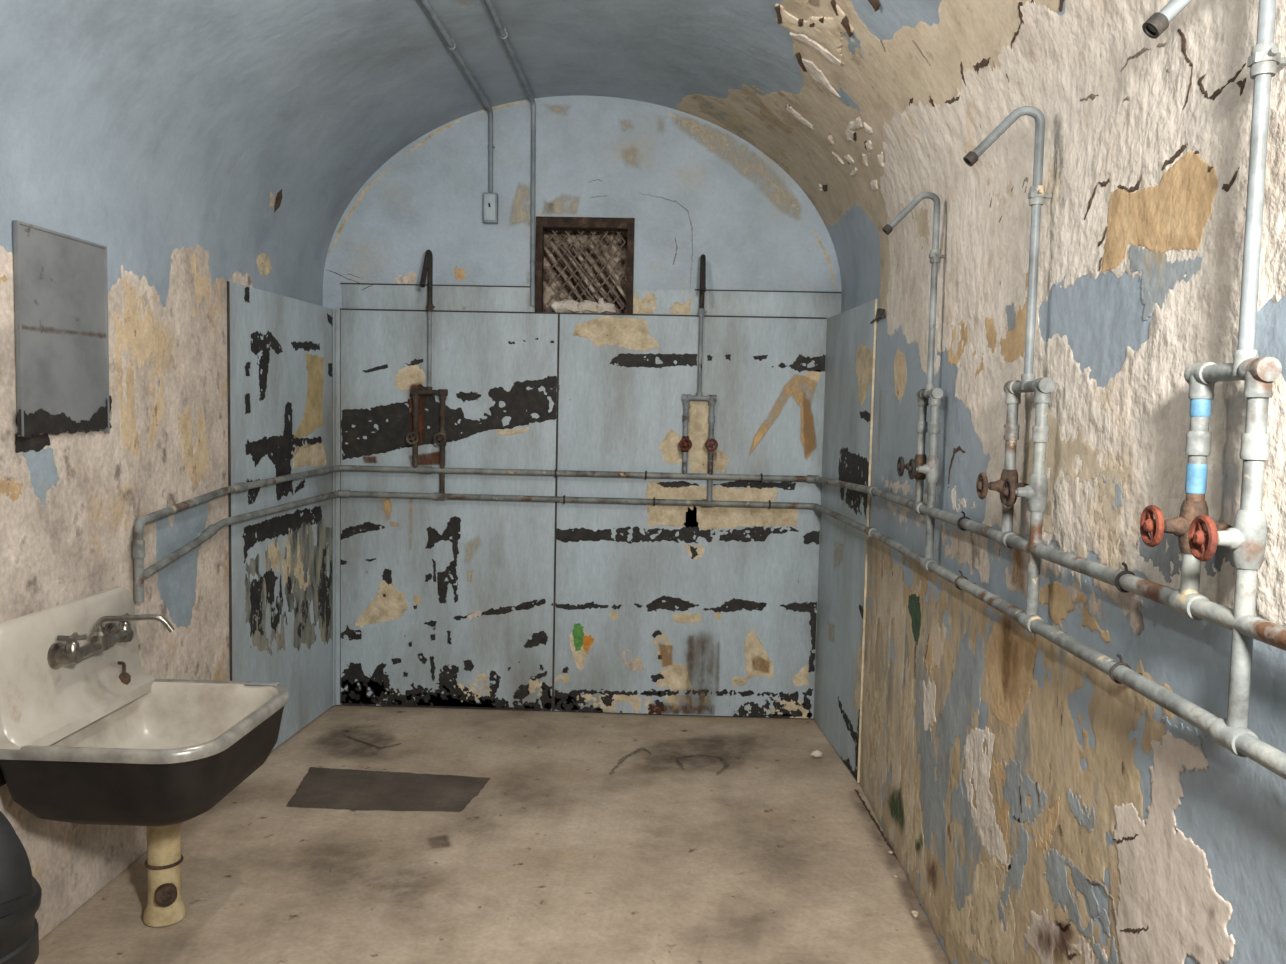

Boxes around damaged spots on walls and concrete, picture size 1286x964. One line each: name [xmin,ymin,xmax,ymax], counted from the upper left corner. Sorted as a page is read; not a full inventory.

peeling [269,189,282,213]
peeling [1257,0,1286,312]
peeling [0,243,834,718]
rust [411,452,440,465]
peeling [666,0,1259,964]
peeling [1255,374,1286,625]
peeling [0,784,147,940]